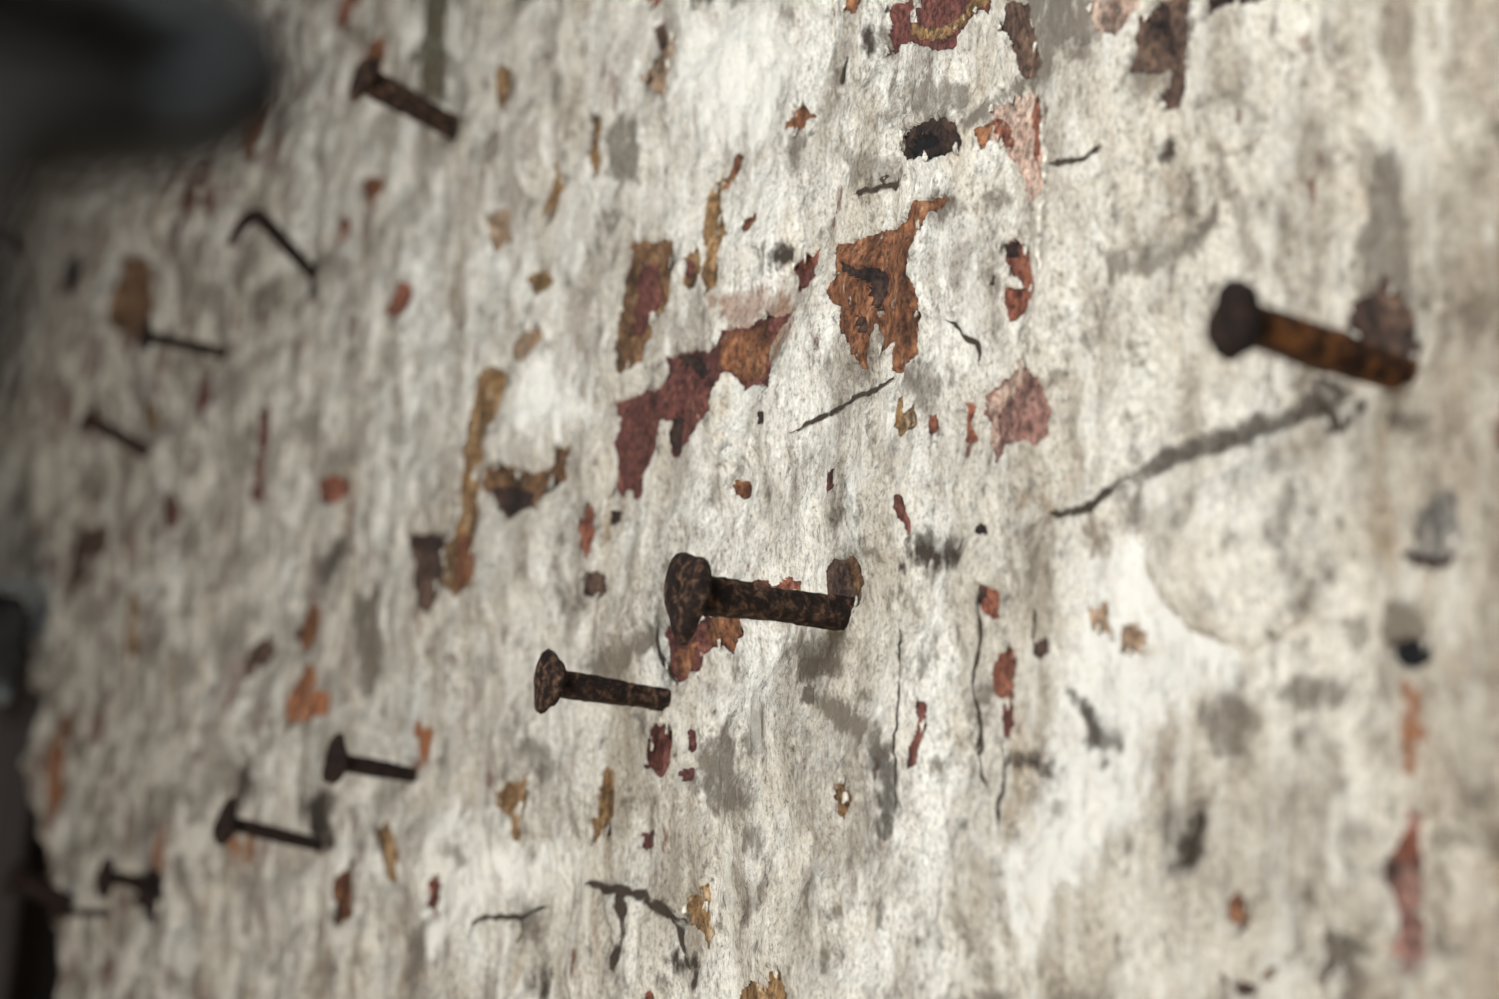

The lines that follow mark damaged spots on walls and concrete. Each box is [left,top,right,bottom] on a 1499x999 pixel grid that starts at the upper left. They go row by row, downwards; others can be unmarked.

peeling [883,0,1048,201]
peeling [1086,0,1260,113]
peeling [789,196,955,374]
peeling [407,320,571,620]
peeling [575,305,791,603]
crack [790,377,894,433]
peeling [965,350,1052,464]
crack [1048,392,1351,518]
crack [971,590,1005,828]
crack [468,906,547,943]
crack [585,880,690,970]
peeling [740,965,787,999]